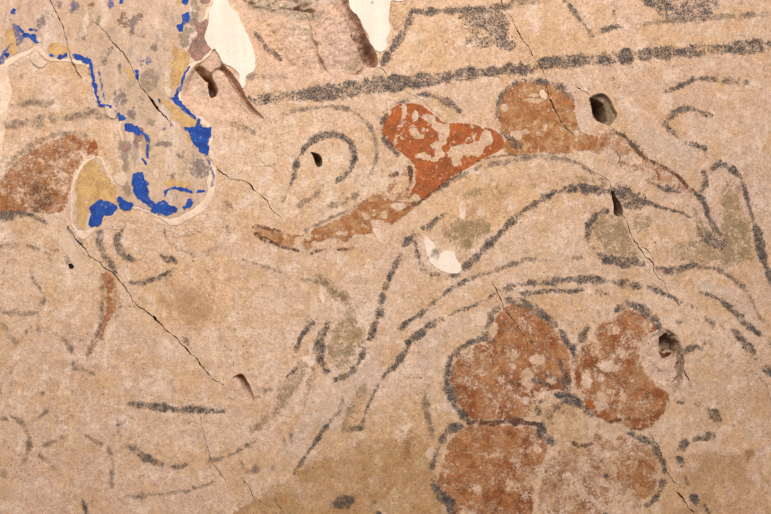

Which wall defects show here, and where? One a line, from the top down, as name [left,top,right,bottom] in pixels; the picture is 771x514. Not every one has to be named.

crack [94,22,174,127]
flaking render [234,0,389,85]
crack [501,0,579,140]
peeling [0,0,267,284]
peeling [424,237,461,274]
crack [69,230,226,388]
peeling [302,343,316,368]
peeling [362,321,371,347]
flaking render [640,327,684,397]
crack [649,431,694,513]